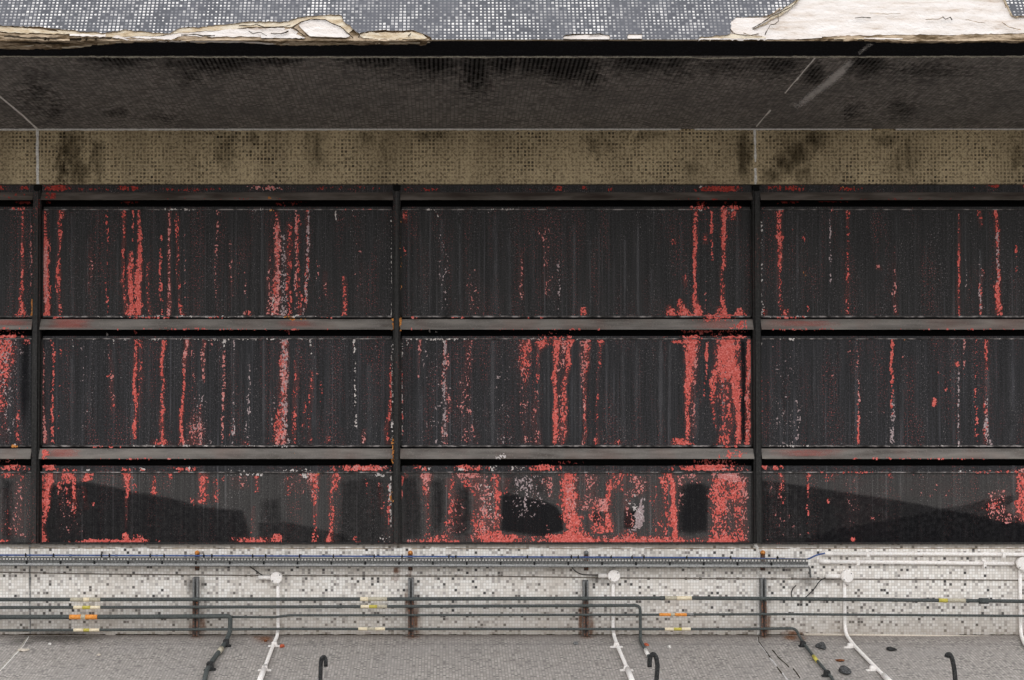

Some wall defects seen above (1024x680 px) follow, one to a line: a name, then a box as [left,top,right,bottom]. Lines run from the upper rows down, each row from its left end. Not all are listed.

spalling [0,15,430,50]
spalling [698,0,1024,44]
leakage [739,137,751,173]
peeling [768,185,831,331]
peeling [957,210,1003,316]
peeling [42,340,160,542]
peeling [0,185,251,507]
peeling [284,464,404,542]
peeling [406,186,763,542]
peeling [889,339,904,444]
peeling [806,457,1024,524]
peeling [932,328,993,445]